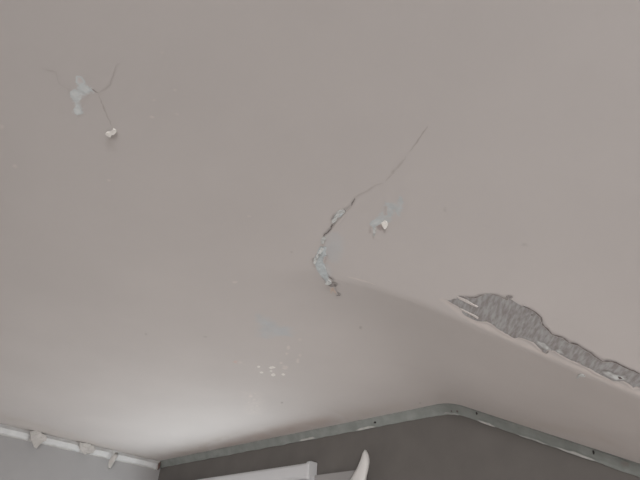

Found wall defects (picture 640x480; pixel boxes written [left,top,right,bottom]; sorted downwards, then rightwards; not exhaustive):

peeling [40,64,120,154]
crack [311,126,428,296]
peeling [437,294,640,398]